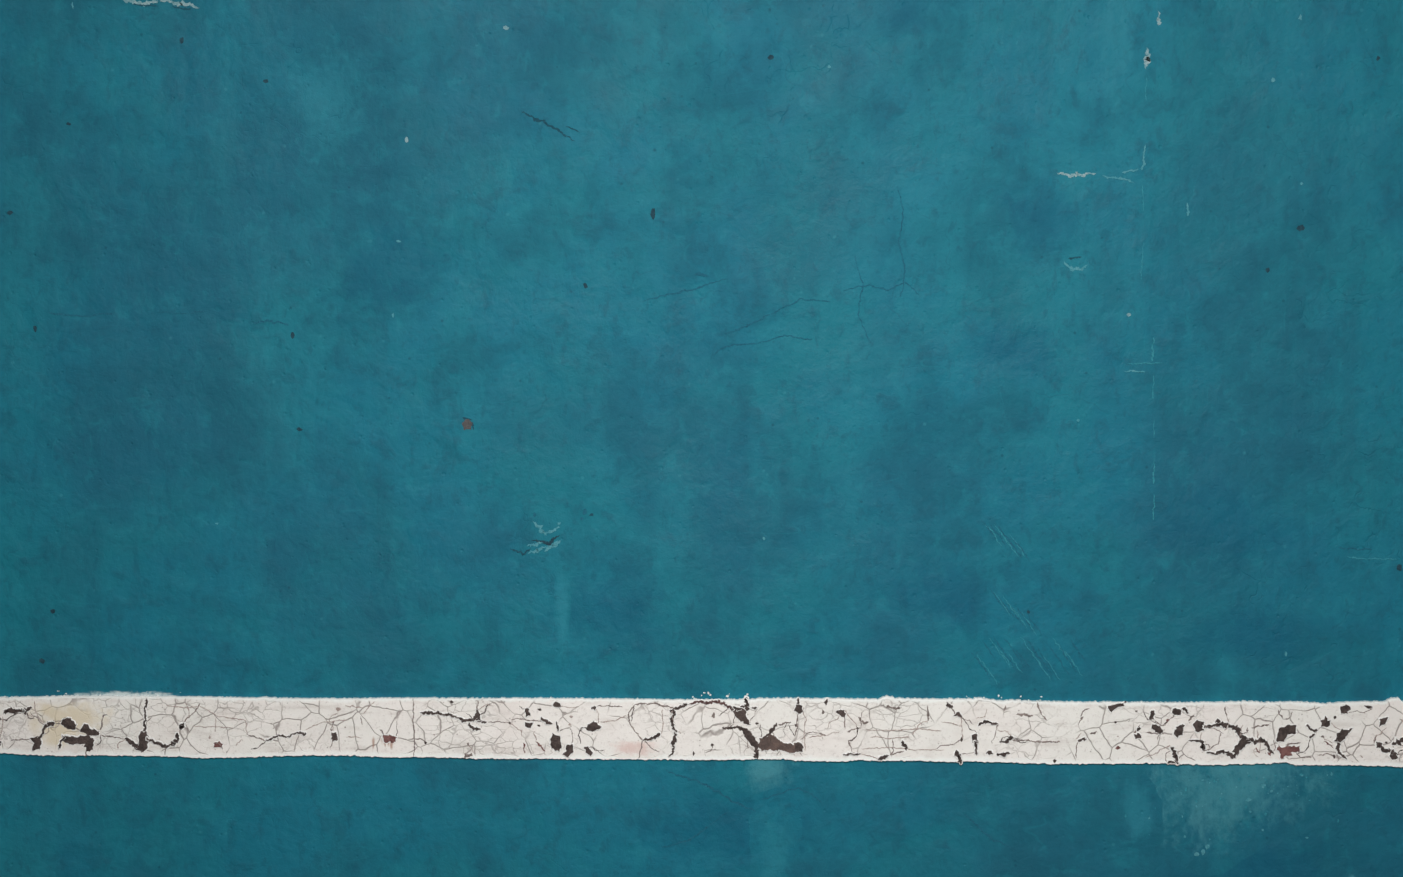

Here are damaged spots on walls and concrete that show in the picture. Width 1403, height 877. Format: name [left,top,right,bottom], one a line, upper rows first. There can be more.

peeling [511,513,561,556]
peeling [2,705,34,719]
crack [0,701,66,752]
peeling [52,714,107,758]
crack [96,697,522,756]
peeling [512,701,626,759]
crack [628,695,807,758]
spalling [711,697,868,759]
crack [842,701,1097,765]
crack [1145,706,1276,766]
crack [1319,704,1403,761]
peeling [1174,705,1403,831]